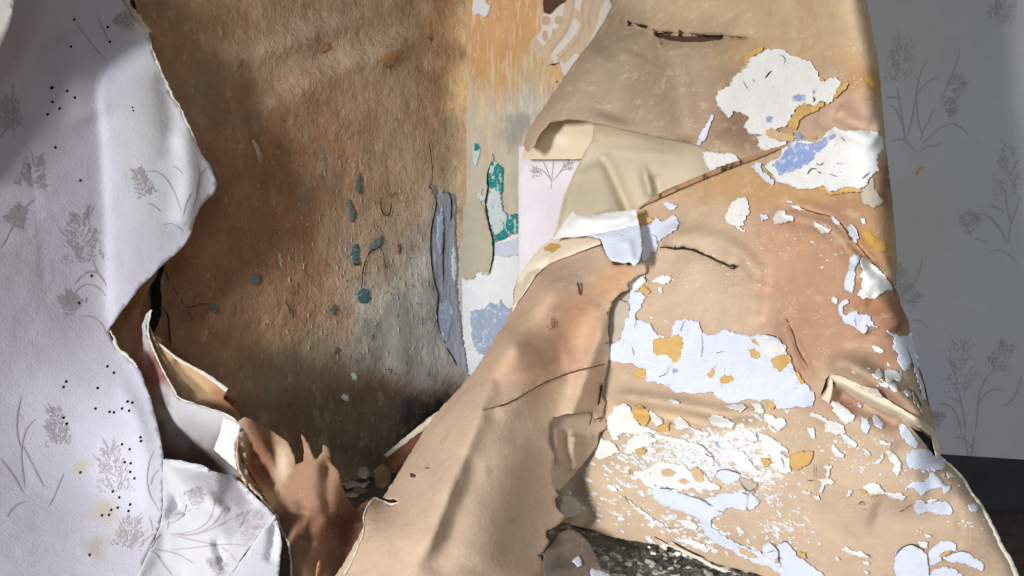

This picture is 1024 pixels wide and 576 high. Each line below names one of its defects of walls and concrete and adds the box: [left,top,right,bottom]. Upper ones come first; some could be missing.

peeling [696,47,884,209]
peeling [325,143,519,376]
peeling [567,197,986,576]